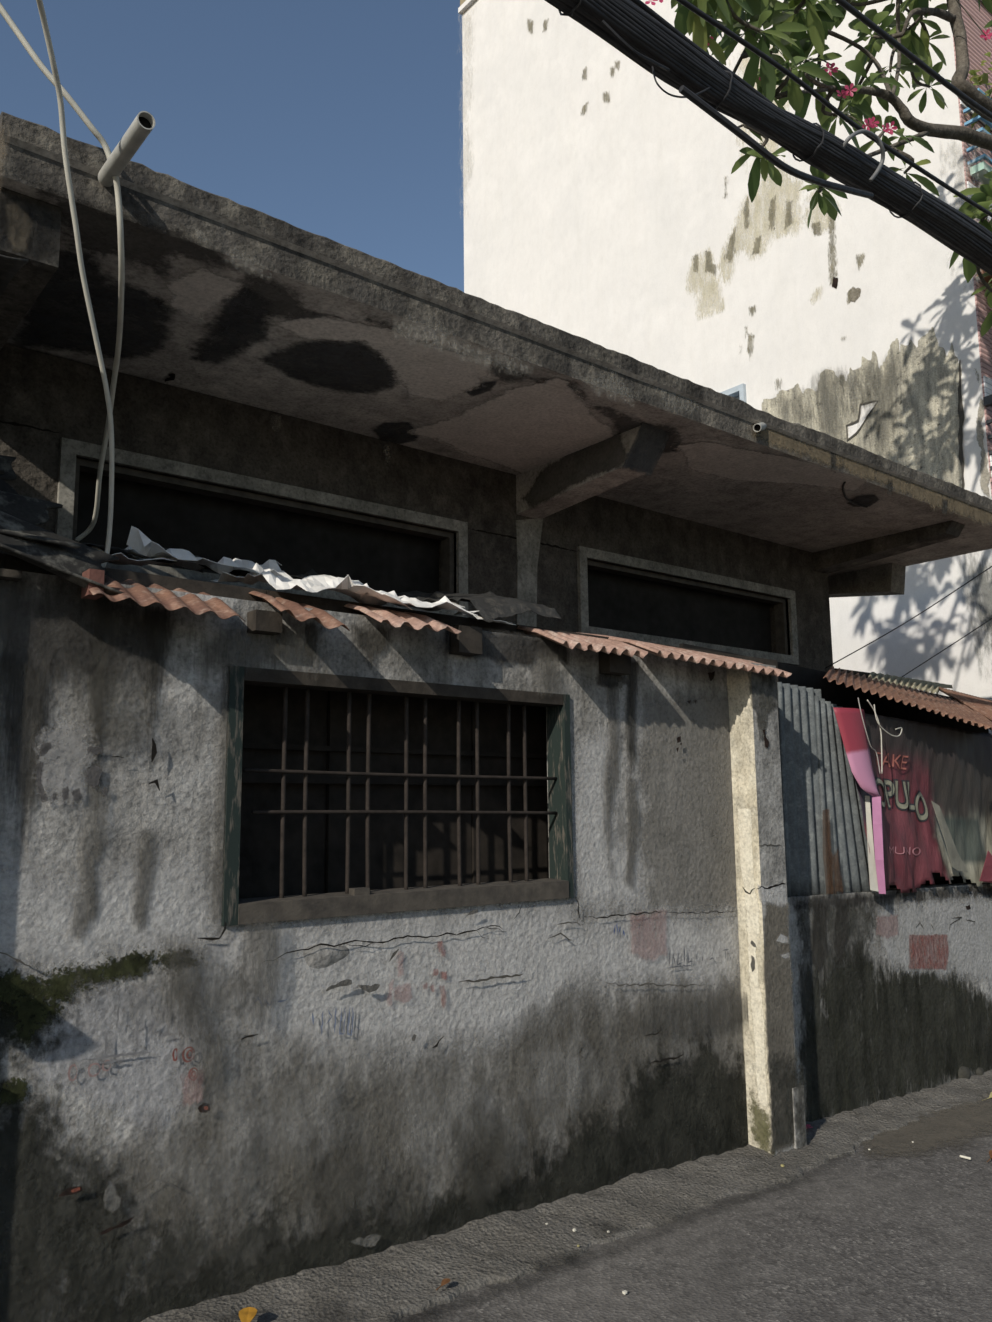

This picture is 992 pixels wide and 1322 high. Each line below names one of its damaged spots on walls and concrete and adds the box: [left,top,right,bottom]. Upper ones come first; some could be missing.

damp [14,183,395,394]
peeling [689,169,830,317]
damp [753,423,992,525]
peeling [762,327,991,497]
damp [0,596,48,838]
damp [90,596,126,765]
damp [967,563,992,652]
damp [136,831,152,926]
crack [278,906,522,958]
crack [548,883,785,941]
damp [763,884,992,1159]
damp [0,994,749,1322]